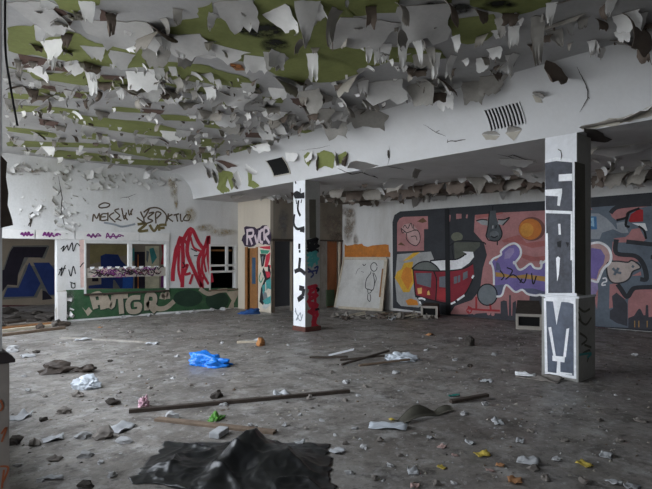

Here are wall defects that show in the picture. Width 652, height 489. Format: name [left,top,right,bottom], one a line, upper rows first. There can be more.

peeling [3,0,652,239]